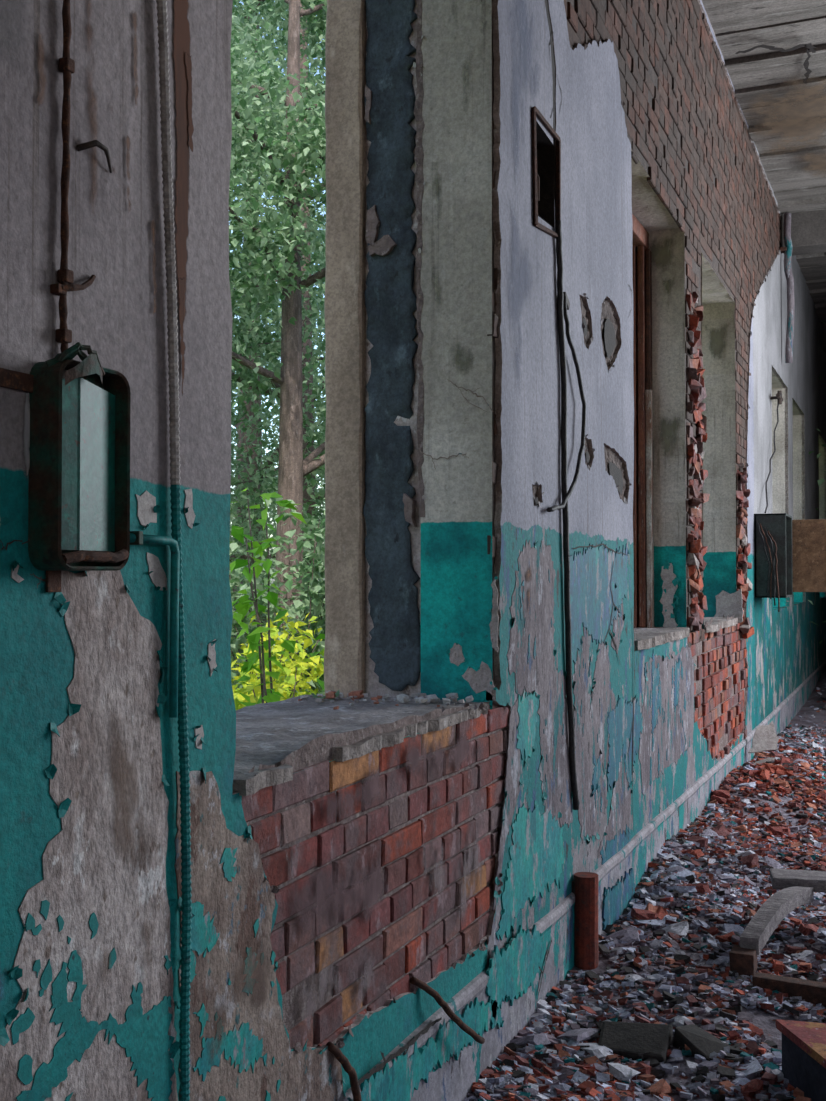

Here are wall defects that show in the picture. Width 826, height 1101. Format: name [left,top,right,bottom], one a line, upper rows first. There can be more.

rust [173,0,194,396]
peeling [0,213,633,1101]
flaking render [564,0,781,795]
crack [735,43,817,84]